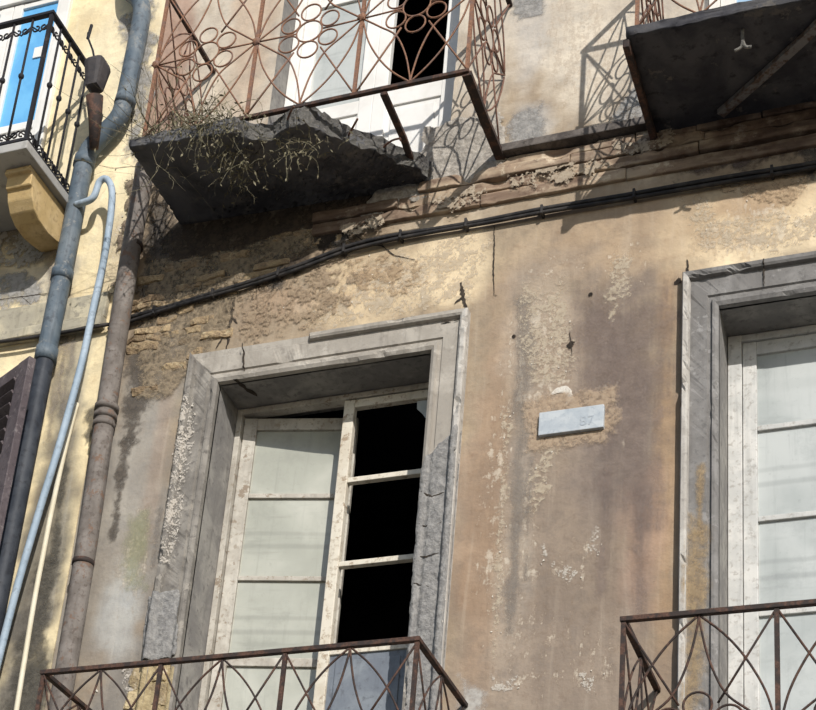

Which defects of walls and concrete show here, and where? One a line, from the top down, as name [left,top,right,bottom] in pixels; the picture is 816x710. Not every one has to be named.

spalling [420,112,507,183]
spalling [360,184,432,216]
spalling [0,230,45,310]
water stain [138,191,373,299]
crack [441,282,467,323]
crack [490,228,498,296]
water stain [109,350,153,541]
flaking render [126,228,491,564]
water stain [522,387,621,450]
spalling [405,424,462,710]
flaking render [122,665,174,710]
water stain [461,689,482,710]